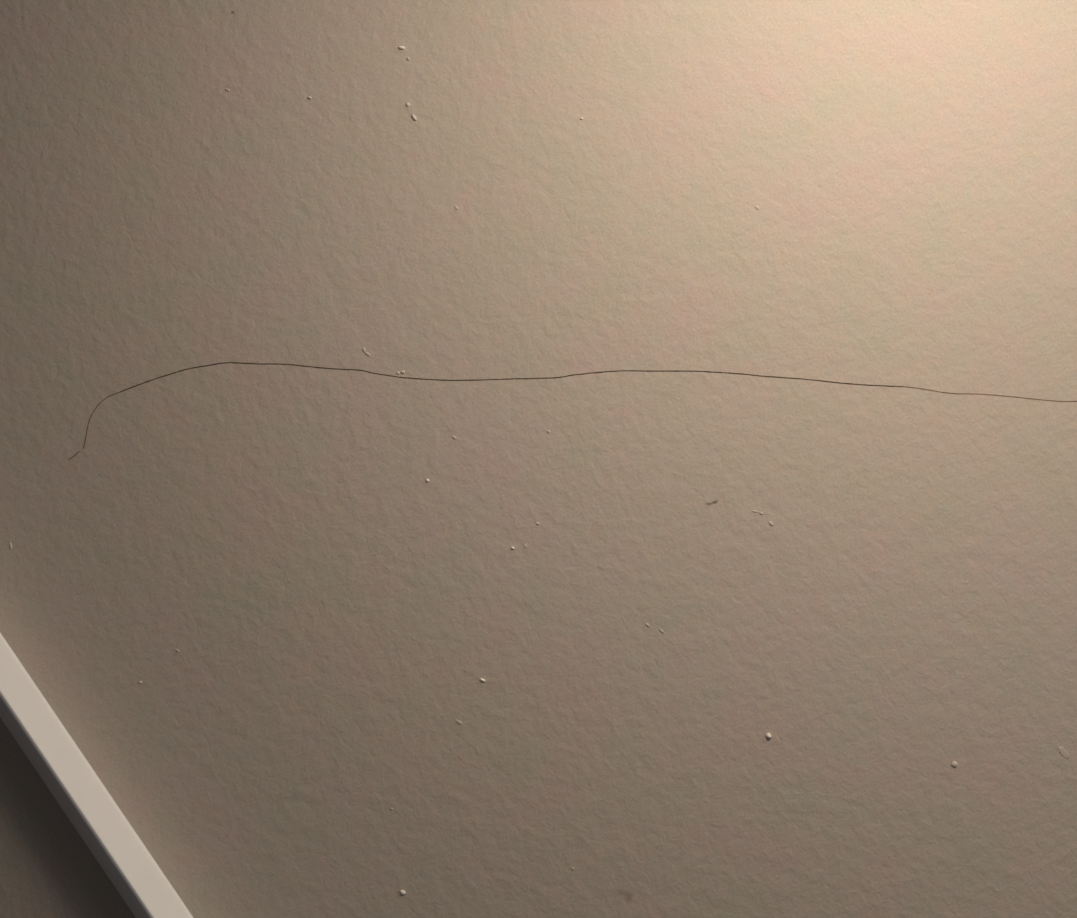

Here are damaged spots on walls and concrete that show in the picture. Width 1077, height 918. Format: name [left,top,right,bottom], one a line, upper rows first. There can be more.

crack [68,362,1077,460]